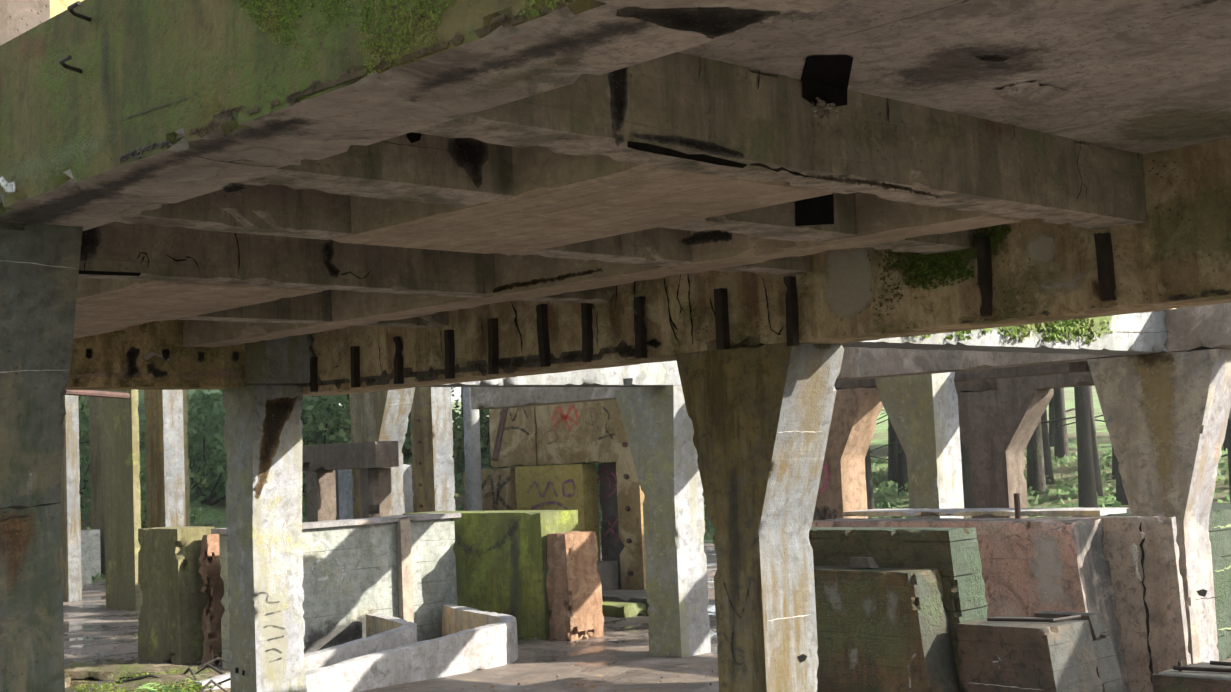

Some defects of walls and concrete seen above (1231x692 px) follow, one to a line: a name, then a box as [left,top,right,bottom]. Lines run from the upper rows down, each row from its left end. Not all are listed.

damp [901,48,1041,85]
peeling [0,177,15,192]
spalling [222,184,247,192]
crack [750,163,809,178]
crack [137,252,199,270]
spalling [1167,289,1230,301]
crack [592,274,715,349]
spalling [255,338,662,499]
crack [0,502,62,533]
crack [1139,522,1153,683]